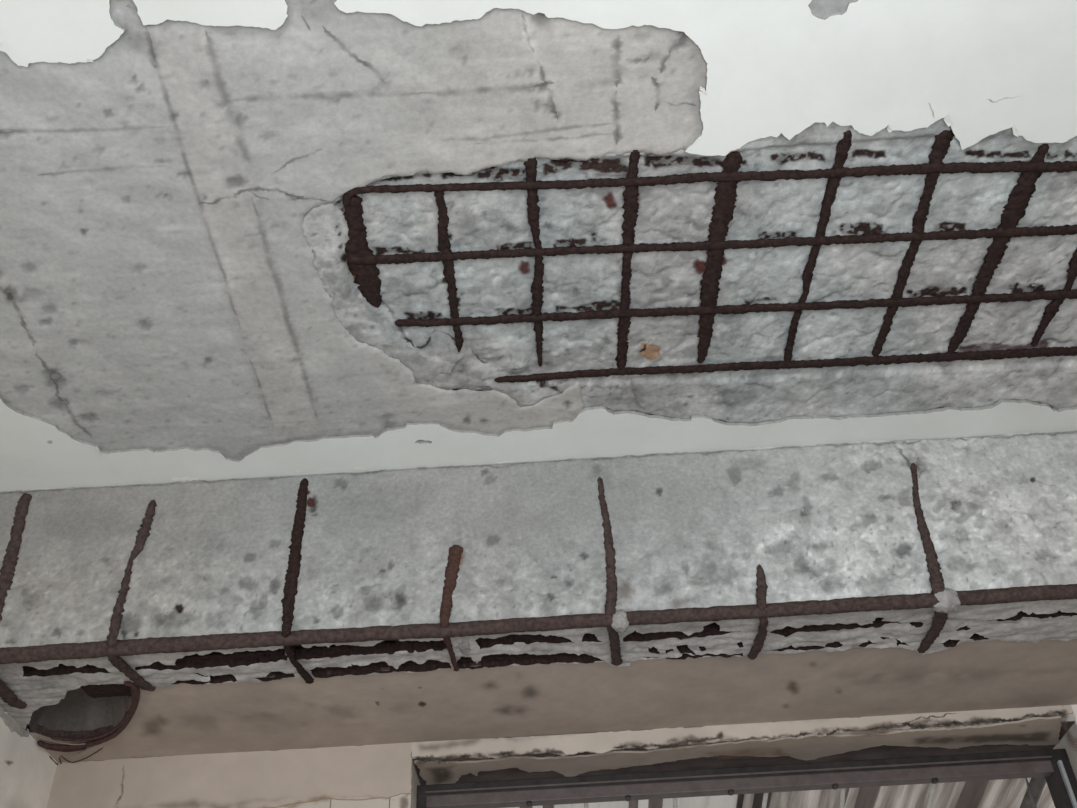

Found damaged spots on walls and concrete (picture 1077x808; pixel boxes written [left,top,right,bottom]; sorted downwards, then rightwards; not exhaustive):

corrosion [544,158,628,175]
corrosion [645,153,722,168]
corrosion [771,152,825,164]
corrosion [853,149,886,158]
corrosion [965,150,1030,158]
corrosion [381,167,526,181]
flaking render [0,0,1077,460]
corrosion [840,222,883,235]
corrosion [497,242,532,274]
corrosion [907,287,966,298]
corrosion [556,300,621,312]
spalling [0,431,1077,731]